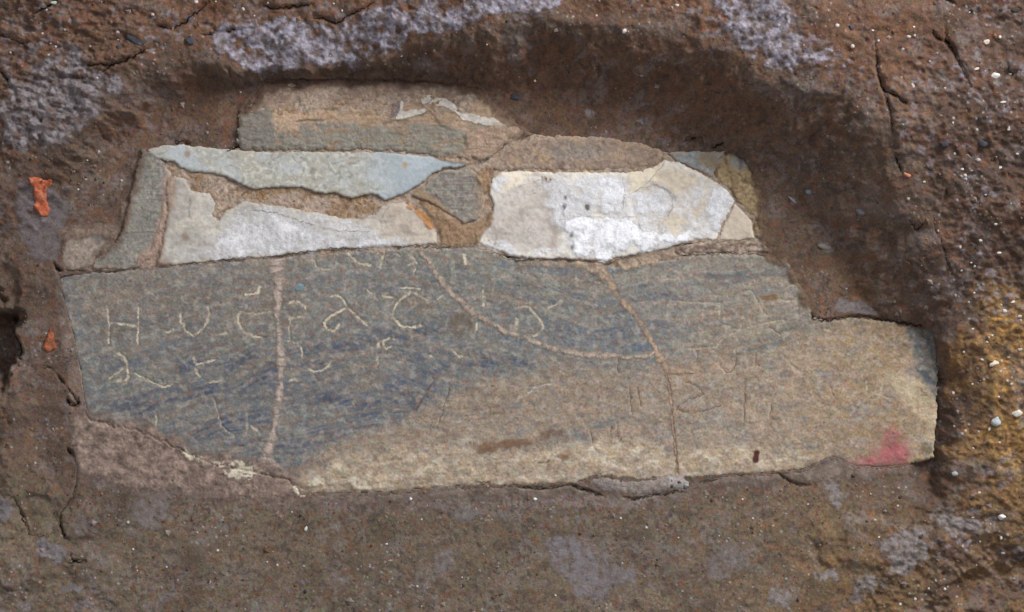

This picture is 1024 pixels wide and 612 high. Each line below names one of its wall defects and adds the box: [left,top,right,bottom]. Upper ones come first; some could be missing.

crack [874,34,907,171]
crack [15,335,79,406]
crack [389,245,809,501]
crack [14,447,84,563]